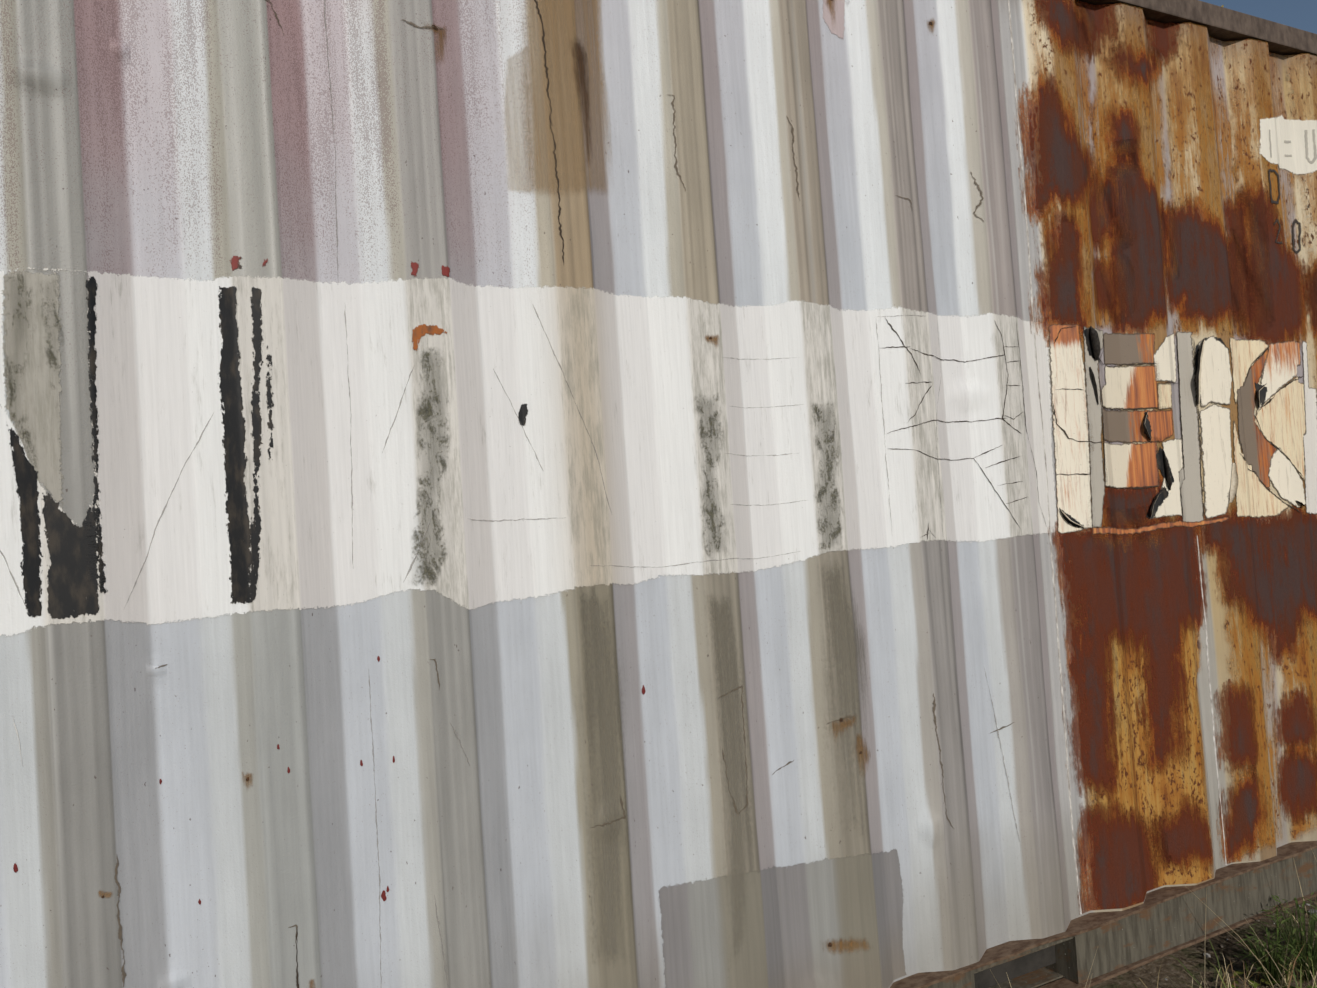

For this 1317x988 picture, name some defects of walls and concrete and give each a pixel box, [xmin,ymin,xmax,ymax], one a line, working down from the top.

crack [535,0,564,262]
rust [1018,0,1317,381]
damp [414,352,448,584]
peeling [518,404,528,426]
damp [697,398,724,552]
damp [815,406,841,548]
crack [876,315,1204,539]
crack [1243,346,1303,511]
rust [1053,470,1317,914]